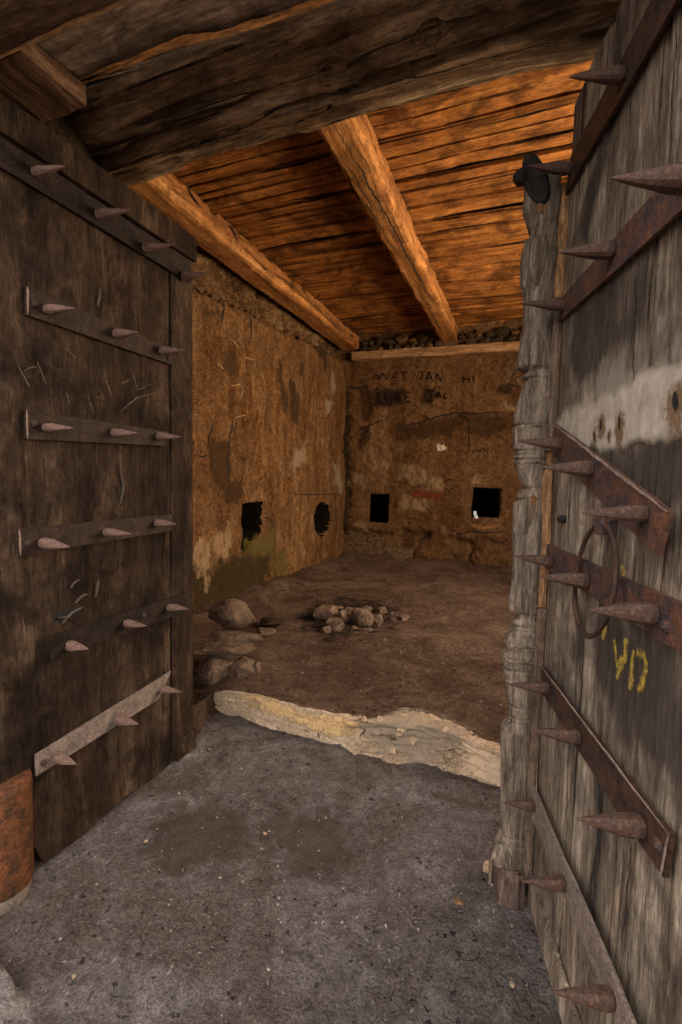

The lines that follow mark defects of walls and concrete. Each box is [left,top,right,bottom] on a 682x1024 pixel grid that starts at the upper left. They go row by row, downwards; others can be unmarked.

crack [360,411,508,454]
water stain [193,547,270,608]